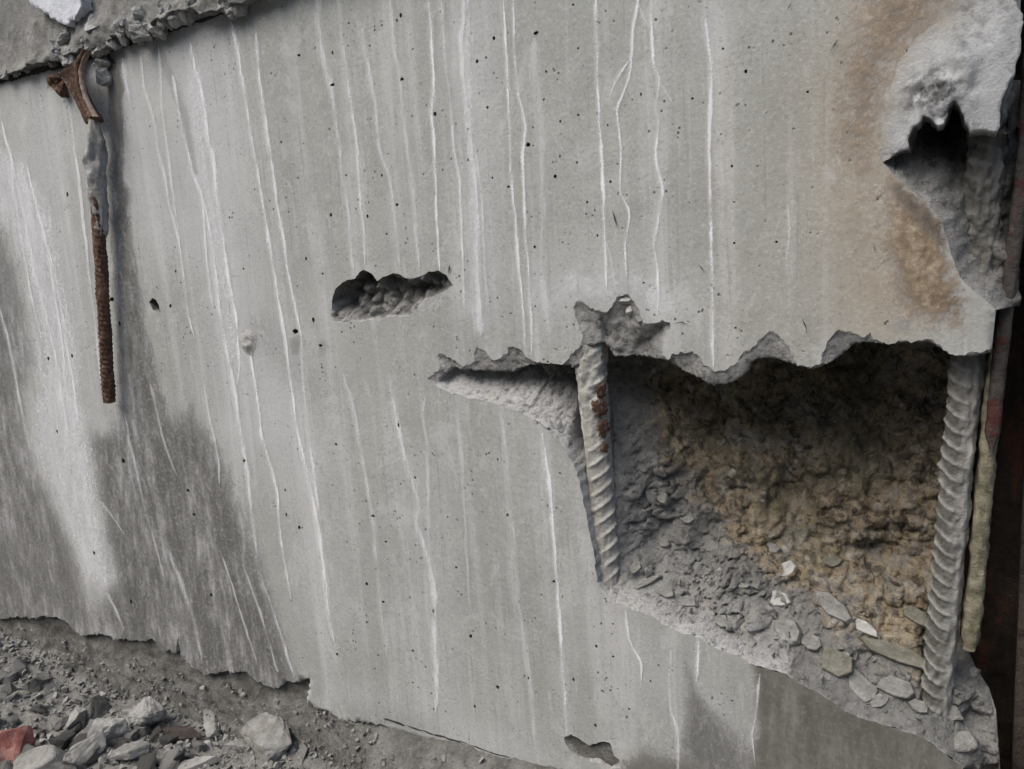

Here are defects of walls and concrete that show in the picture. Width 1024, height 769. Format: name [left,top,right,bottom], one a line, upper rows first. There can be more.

leakage [0,43,297,689]
leakage [231,22,335,643]
spalling [331,270,453,322]
leakage [428,0,445,270]
leakage [503,0,533,351]
leakage [542,433,567,710]
rust [591,382,610,453]
leakage [594,0,671,315]
leakage [704,1,715,367]
spalling [428,293,1000,769]
rust [833,0,967,330]
spalling [883,80,1022,310]